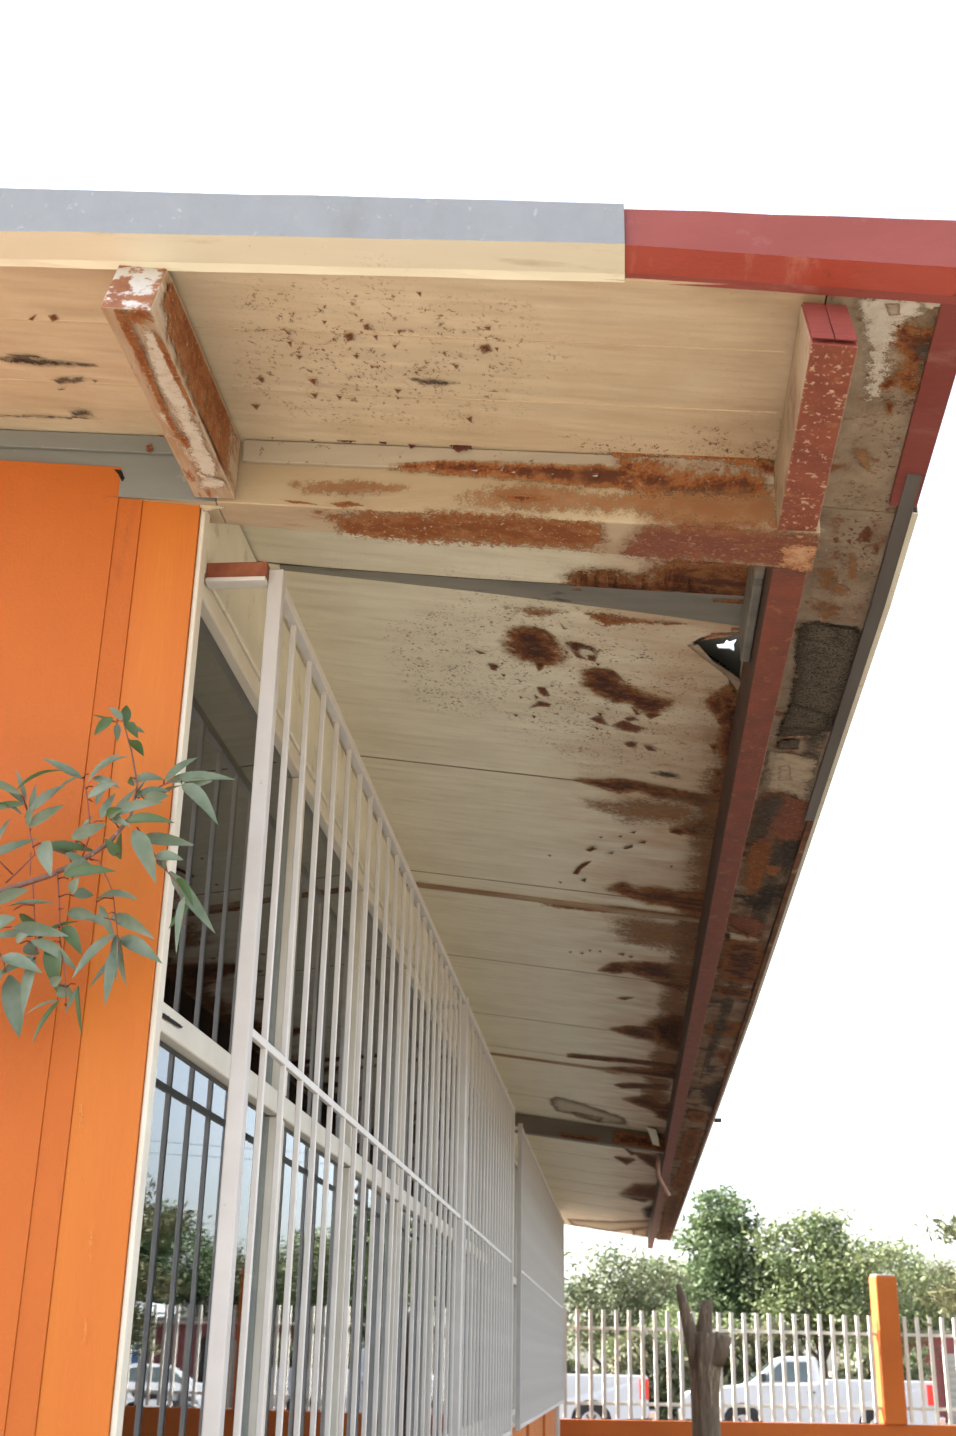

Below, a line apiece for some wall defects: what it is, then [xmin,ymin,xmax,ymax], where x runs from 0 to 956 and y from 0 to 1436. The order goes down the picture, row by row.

peeling [141,327,230,512]
rust [252,288,522,415]
rust [853,322,934,478]
rust [281,426,890,1241]
leakage [550,1096,628,1125]